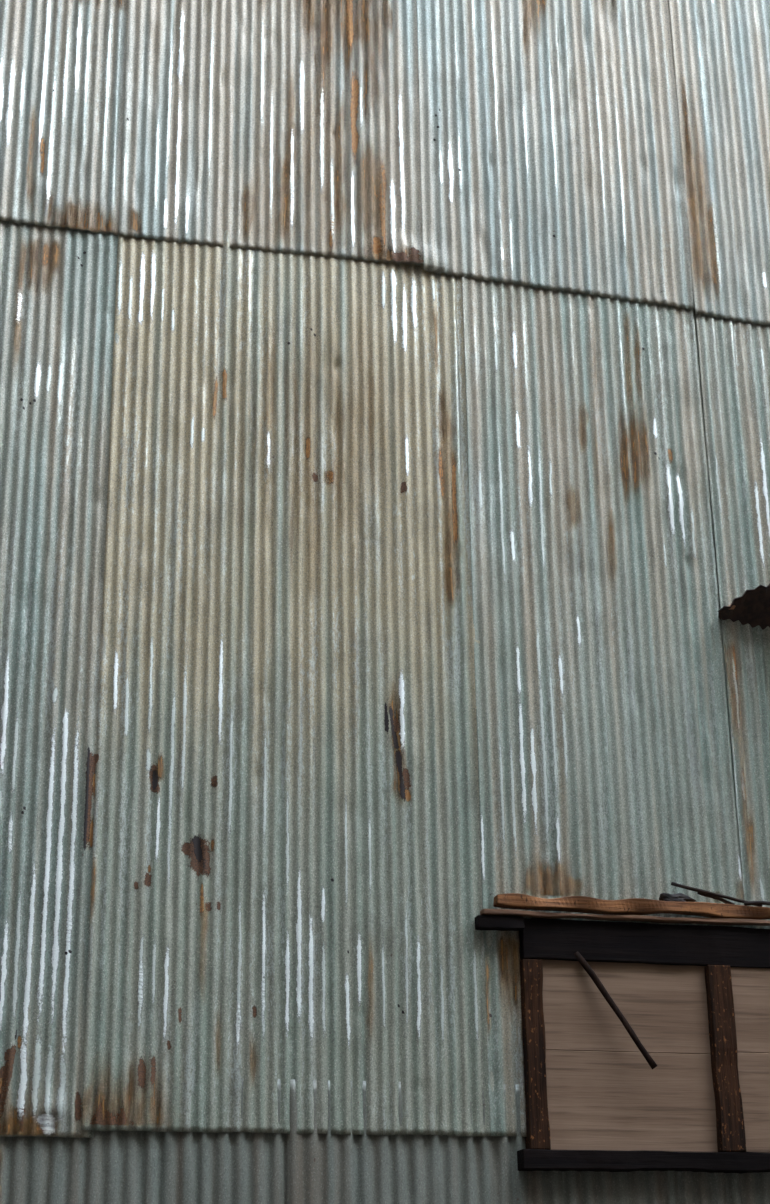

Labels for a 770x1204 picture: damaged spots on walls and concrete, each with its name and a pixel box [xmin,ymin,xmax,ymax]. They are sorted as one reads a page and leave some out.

rust [384,703,399,733]
rust [91,754,99,798]
rust [146,749,164,789]
rust [402,768,411,802]
rust [181,835,221,948]
rust [0,1036,44,1135]